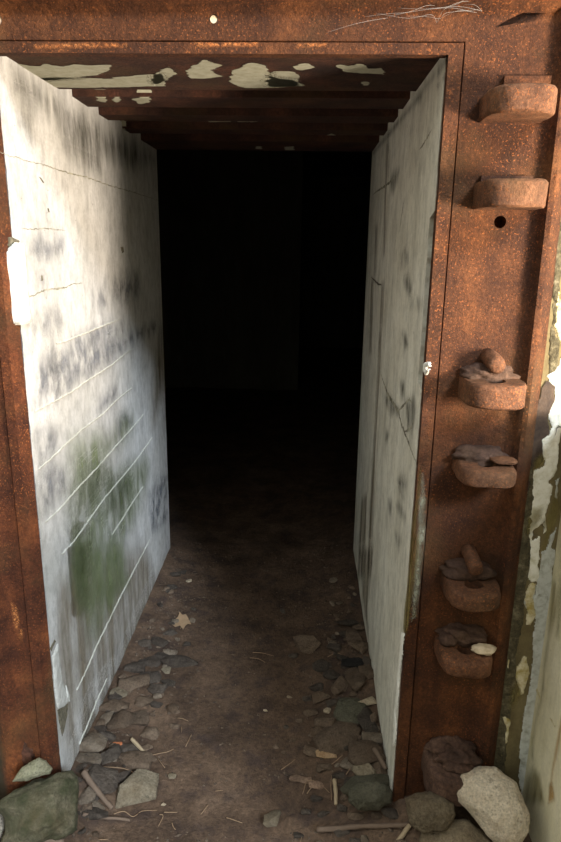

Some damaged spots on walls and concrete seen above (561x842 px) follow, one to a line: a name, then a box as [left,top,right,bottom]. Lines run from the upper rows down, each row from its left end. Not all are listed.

damp [41,340,109,389]
corrosion [459,362,521,383]
corrosion [451,444,509,467]
spalling [494,222,561,793]
corrosion [358,452,375,621]
damp [62,561,149,741]
corrosion [435,622,488,648]
corrosion [21,742,35,766]